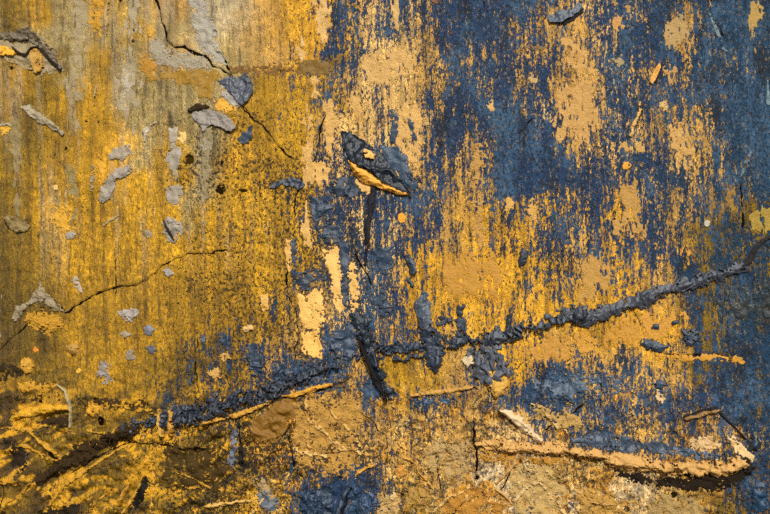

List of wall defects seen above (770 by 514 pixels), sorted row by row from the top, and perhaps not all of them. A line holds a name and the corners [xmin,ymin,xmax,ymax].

peeling [0,27,62,74]
crack [155,0,232,77]
peeling [270,75,412,195]
peeling [385,103,425,172]
crack [54,220,240,314]
peeling [17,379,60,395]
peeling [79,401,105,420]
spalling [206,351,231,382]
spalling [249,392,370,480]
spalling [375,432,708,514]
spalling [515,395,599,433]
peeling [689,434,755,463]